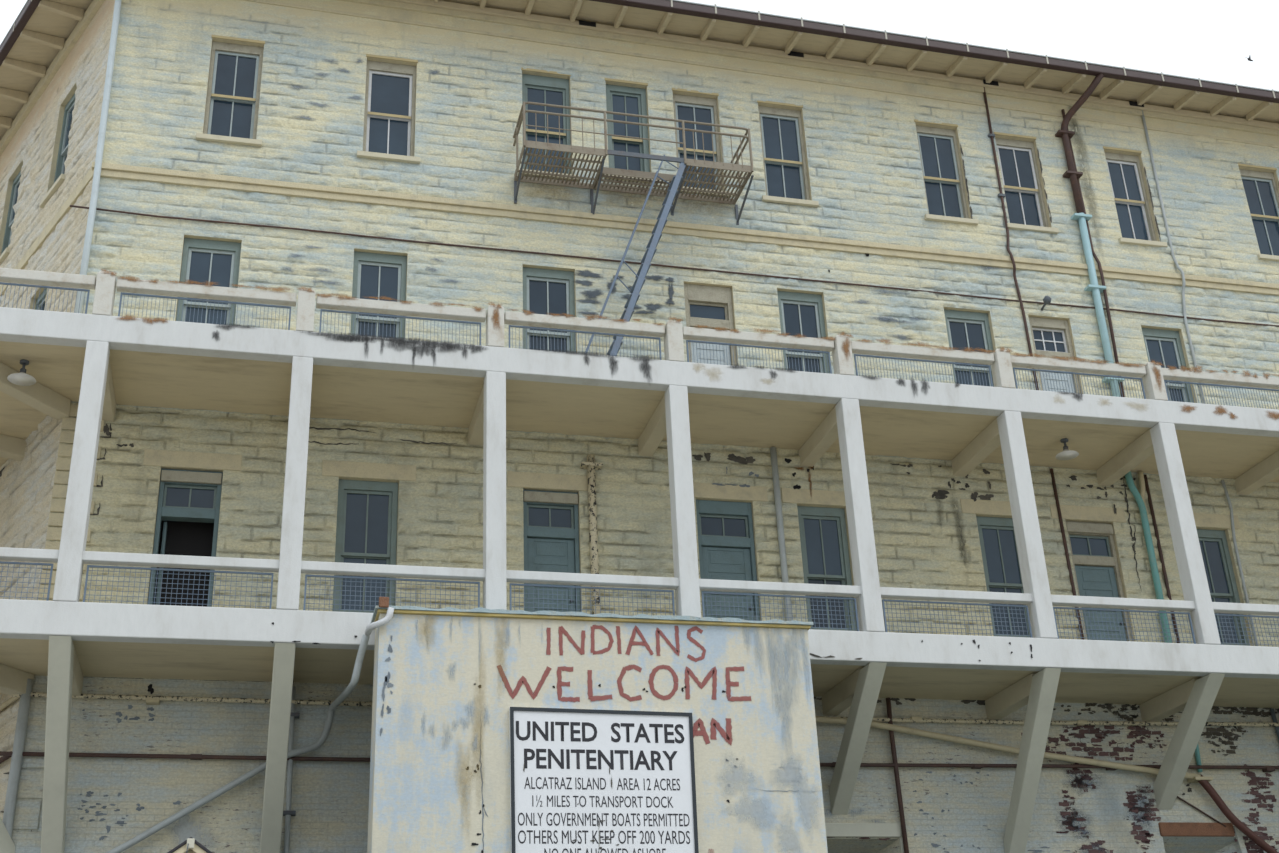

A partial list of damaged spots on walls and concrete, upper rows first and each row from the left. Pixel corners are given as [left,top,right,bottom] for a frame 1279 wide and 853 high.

peeling [575,270,674,315]
spalling [713,453,759,487]
spalling [932,469,994,502]
peeling [1028,703,1182,853]
peeling [1201,706,1279,853]